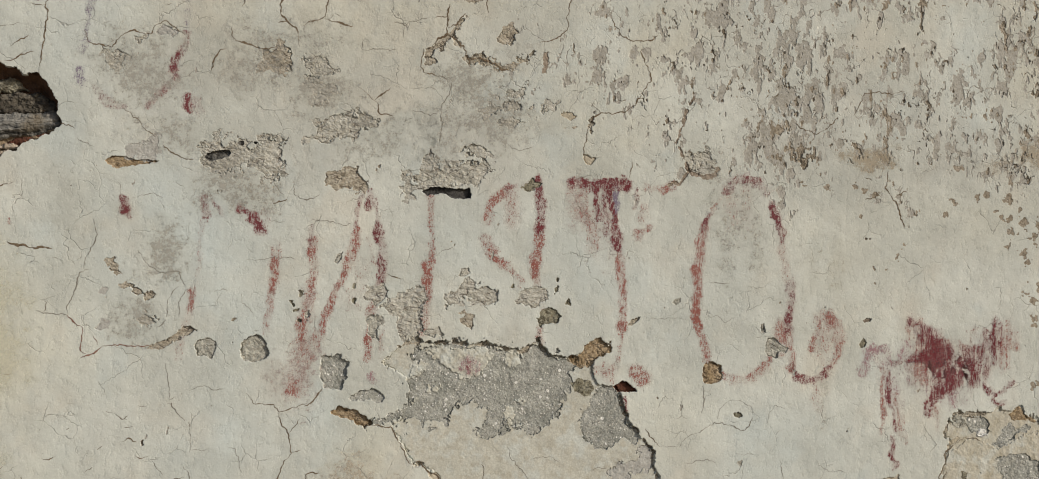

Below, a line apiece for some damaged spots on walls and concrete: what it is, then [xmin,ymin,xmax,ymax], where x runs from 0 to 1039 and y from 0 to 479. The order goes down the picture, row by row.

crack [0,0,49,66]
spalling [0,62,62,151]
spalling [189,129,294,192]
crack [211,0,508,142]
spalling [398,143,496,204]
peeling [424,0,1039,267]
crack [8,242,58,259]
crack [39,219,219,479]
spalling [319,268,661,479]
crack [246,389,322,479]
crack [368,424,439,479]
spalling [940,405,1039,479]